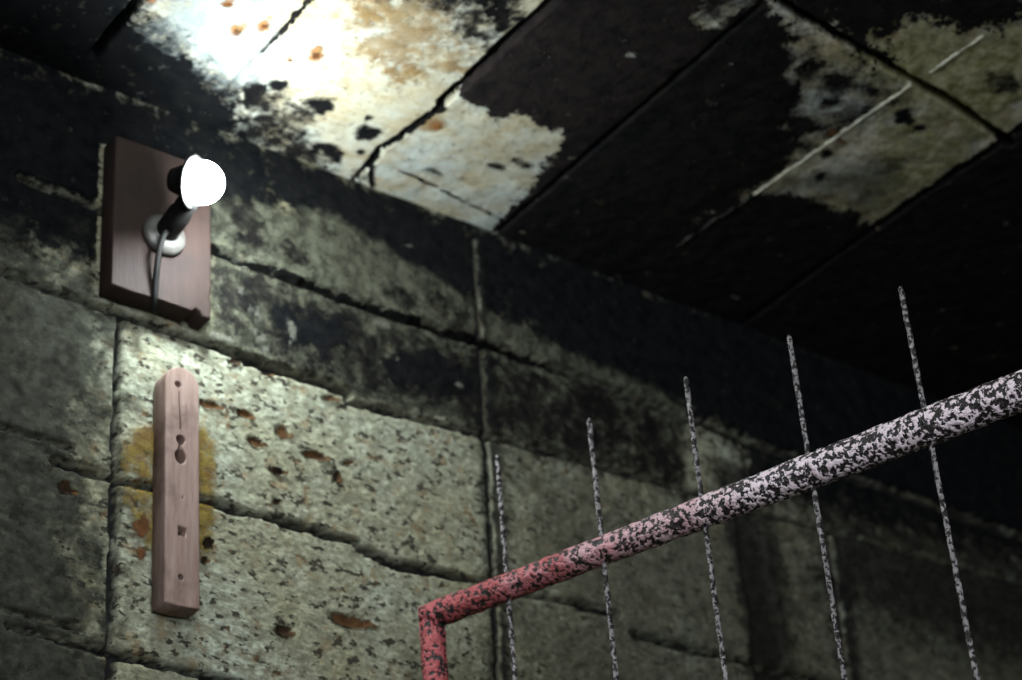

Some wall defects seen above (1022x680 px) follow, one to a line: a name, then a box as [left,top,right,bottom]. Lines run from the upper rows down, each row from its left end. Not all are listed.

corrosion [231,18,271,35]
corrosion [308,46,324,62]
damp [347,0,522,82]
damp [165,0,328,169]
damp [355,115,382,155]
damp [678,26,925,246]
damp [489,134,598,231]
spalling [199,398,224,410]
spalling [238,408,255,420]
spalling [248,436,269,448]
spalling [302,449,357,483]
spalling [330,612,380,629]